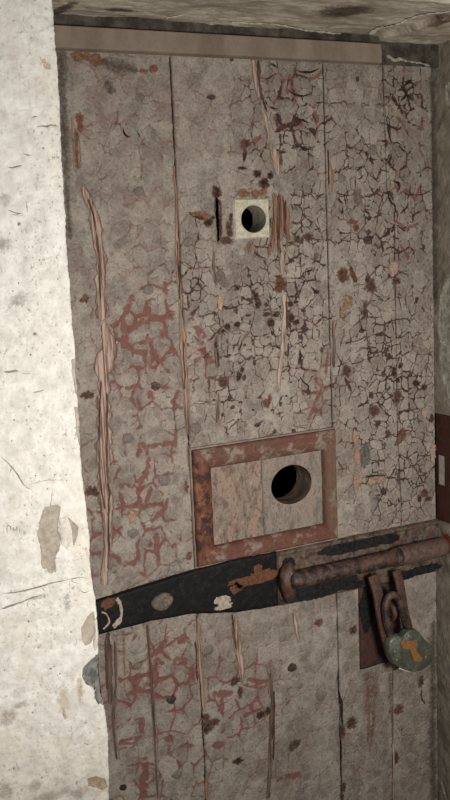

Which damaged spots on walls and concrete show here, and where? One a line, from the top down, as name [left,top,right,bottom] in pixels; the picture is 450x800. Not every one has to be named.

crack [265,63,320,123]
crack [385,80,412,152]
crack [387,181,401,218]
crack [288,330,309,392]
flaking render [37,504,78,573]
corrosion [227,564,280,594]
flaking render [70,597,123,705]